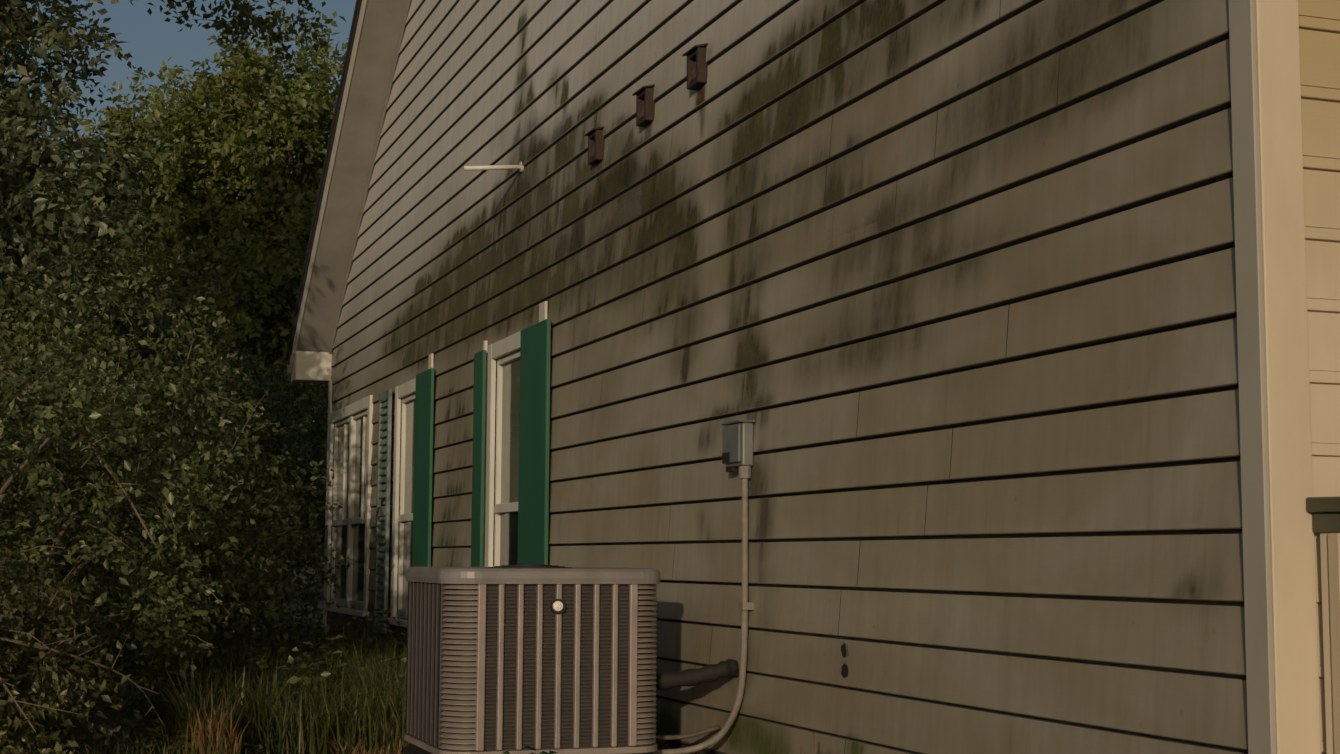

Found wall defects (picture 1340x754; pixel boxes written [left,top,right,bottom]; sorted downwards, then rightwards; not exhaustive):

leakage [985,0,1127,131]
leakage [385,16,699,369]
leakage [713,0,910,423]
leakage [863,204,970,360]
leakage [681,347,690,383]
leakage [750,463,770,552]